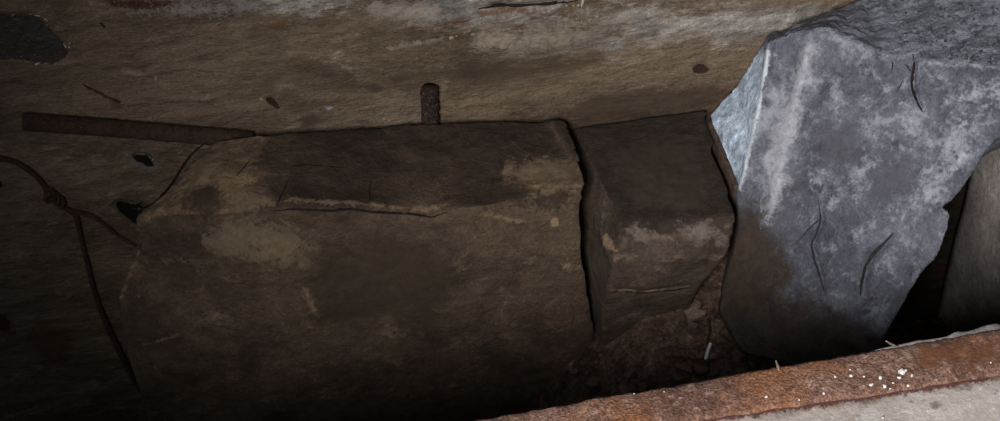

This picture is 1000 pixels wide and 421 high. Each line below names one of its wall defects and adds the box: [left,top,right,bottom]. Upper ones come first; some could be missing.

crack [892,54,923,112]
crack [139,145,203,211]
crack [274,164,447,218]
crack [794,206,824,290]
crack [860,233,893,296]